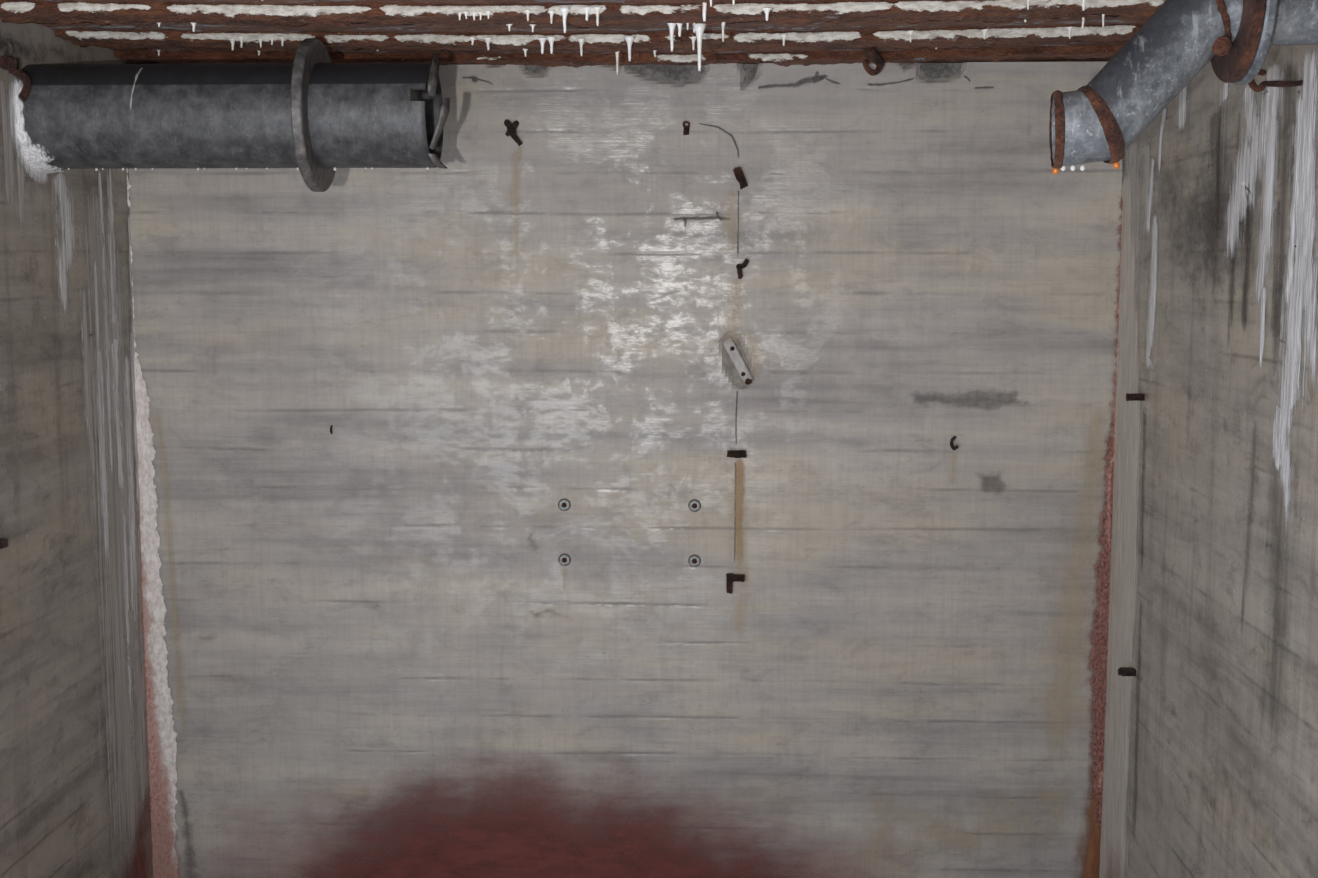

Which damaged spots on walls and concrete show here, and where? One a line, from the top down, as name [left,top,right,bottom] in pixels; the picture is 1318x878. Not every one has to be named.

water stain [0,2,35,13]
water stain [58,2,150,13]
water stain [66,31,165,40]
water stain [167,0,1164,63]
rust [1212,35,1232,57]
water stain [1206,51,1318,520]
water stain [0,77,178,878]
rust [1080,202,1123,878]
rust [287,784,844,878]